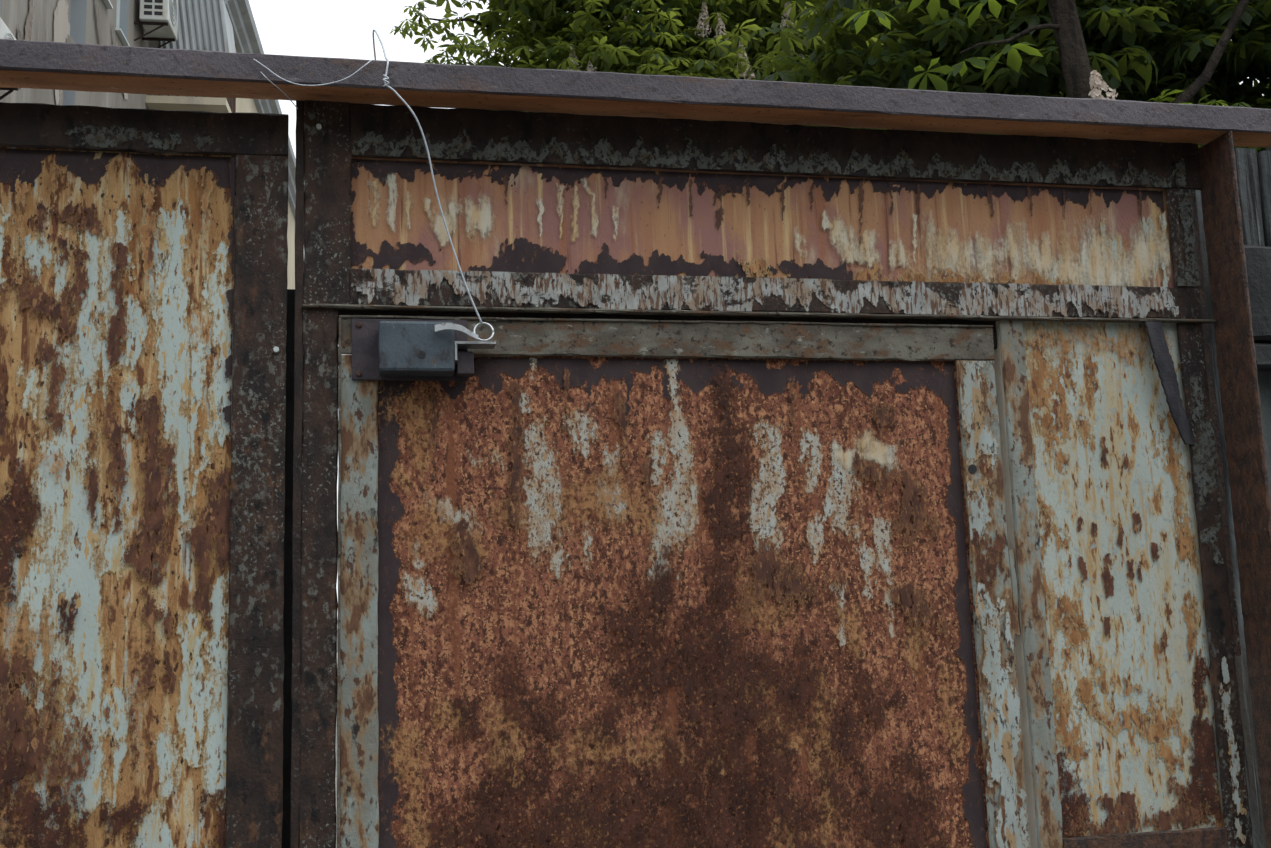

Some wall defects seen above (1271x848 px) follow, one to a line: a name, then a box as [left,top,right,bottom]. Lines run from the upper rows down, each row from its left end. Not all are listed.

rust [351,159,1164,270]
rust [469,237,1075,285]
peeling [351,128,1200,318]
peeling [0,197,234,848]
rust [0,148,236,848]
peeling [402,538,438,618]
peeling [515,358,629,579]
peeling [644,359,699,590]
rust [378,358,1007,848]
peeling [747,419,786,555]
peeling [798,428,898,647]
rust [1024,338,1222,837]